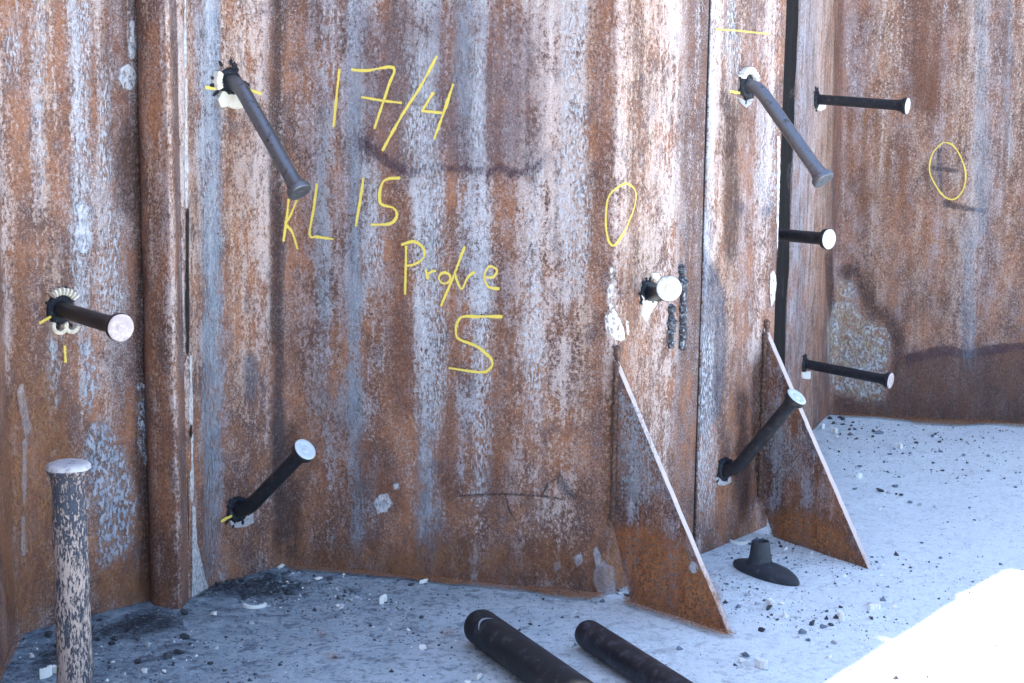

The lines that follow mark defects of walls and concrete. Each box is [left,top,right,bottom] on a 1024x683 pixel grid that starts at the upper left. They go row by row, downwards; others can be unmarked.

corrosion [836,413,1024,426]
corrosion [767,508,863,565]
corrosion [287,564,606,599]
corrosion [617,524,733,635]